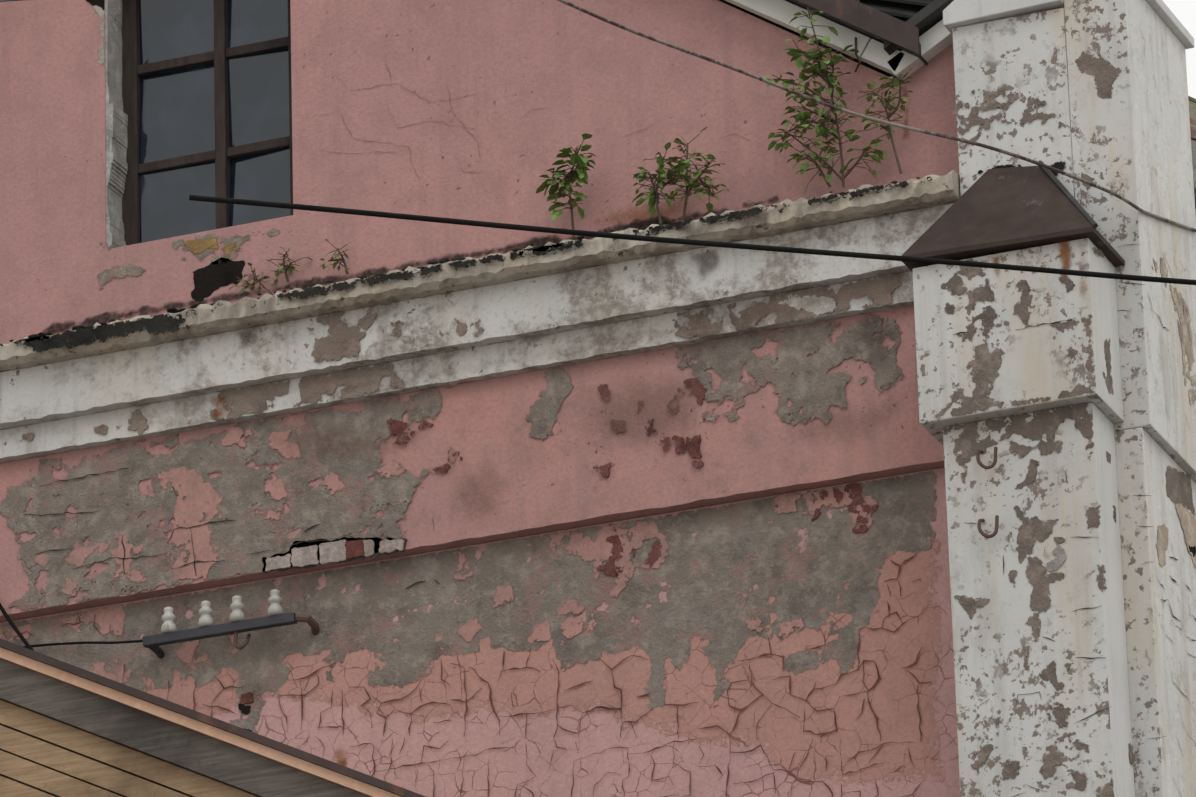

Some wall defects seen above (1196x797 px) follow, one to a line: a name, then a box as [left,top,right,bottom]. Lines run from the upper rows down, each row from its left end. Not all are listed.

peeling [952,85,1064,149]
peeling [1075,51,1121,99]
spalling [172,228,280,301]
flaking render [672,273,905,426]
peeling [921,259,1114,489]
crack [24,468,128,516]
crack [30,520,352,576]
flaking render [0,310,937,734]
flaking render [1155,466,1196,568]
crack [167,677,244,717]
crack [278,553,931,797]
peeling [1008,504,1116,797]